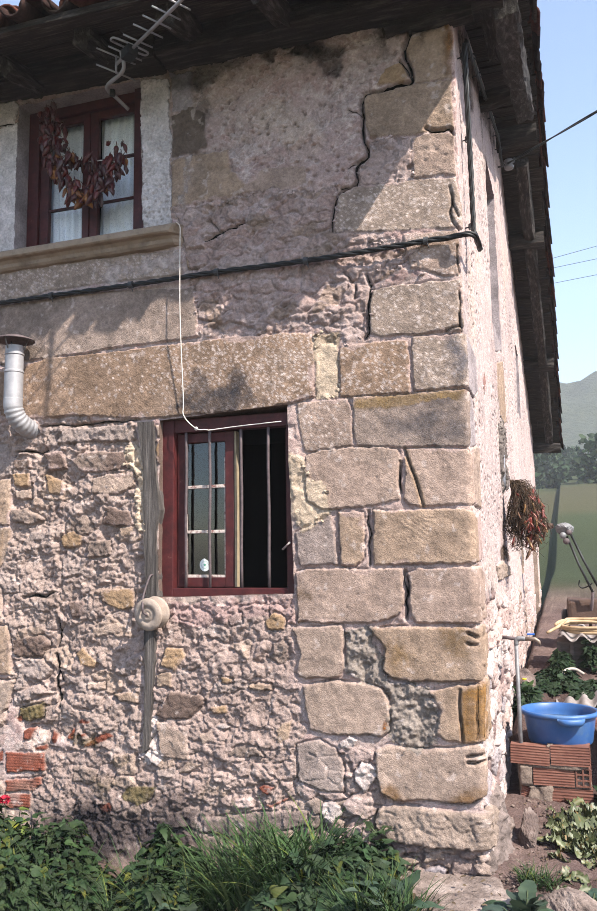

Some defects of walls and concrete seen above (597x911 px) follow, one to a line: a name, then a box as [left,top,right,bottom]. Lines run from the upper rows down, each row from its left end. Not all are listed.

crack [332,36,414,232]
damp [177,377,248,413]
crack [403,573,411,616]
crack [56,623,64,707]